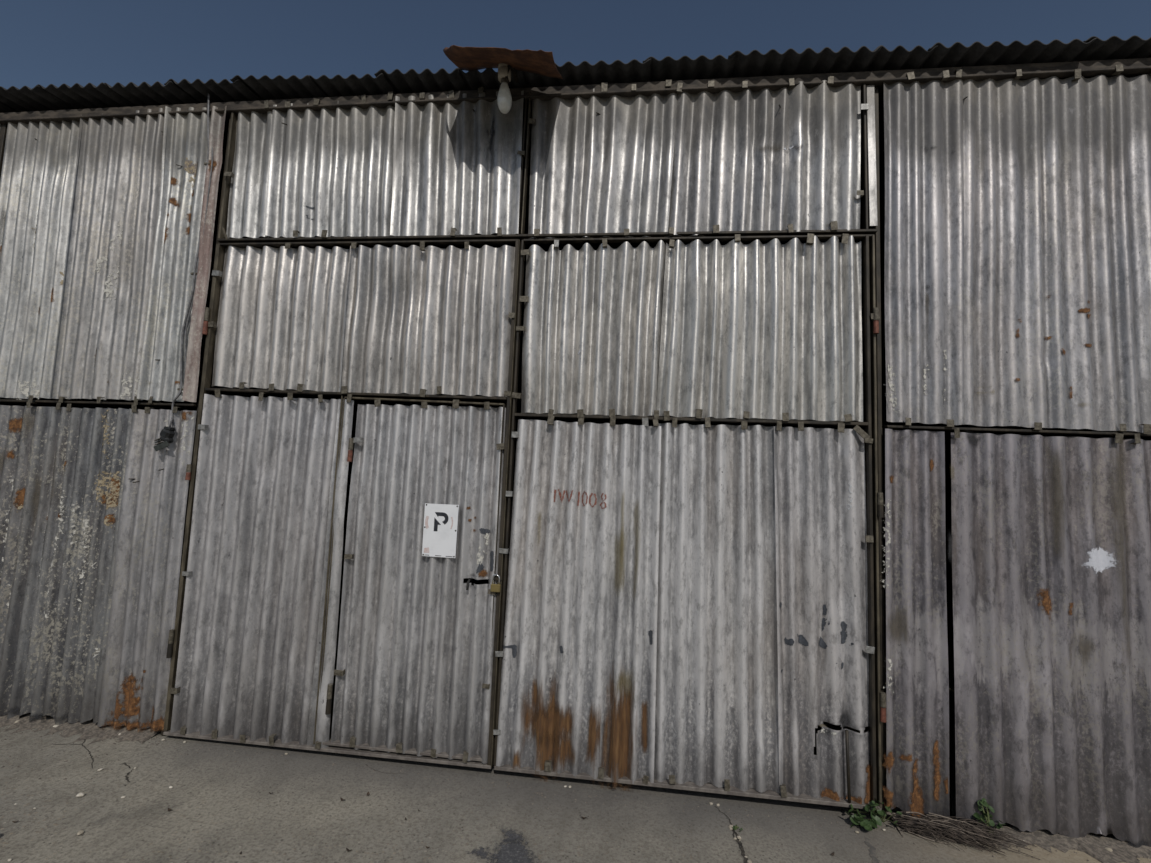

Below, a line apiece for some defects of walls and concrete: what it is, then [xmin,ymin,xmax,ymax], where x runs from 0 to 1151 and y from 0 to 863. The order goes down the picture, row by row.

rust [8,417,34,433]
rust [105,670,165,732]
rust [524,682,574,778]
rust [588,680,647,791]
crack [709,802,752,863]